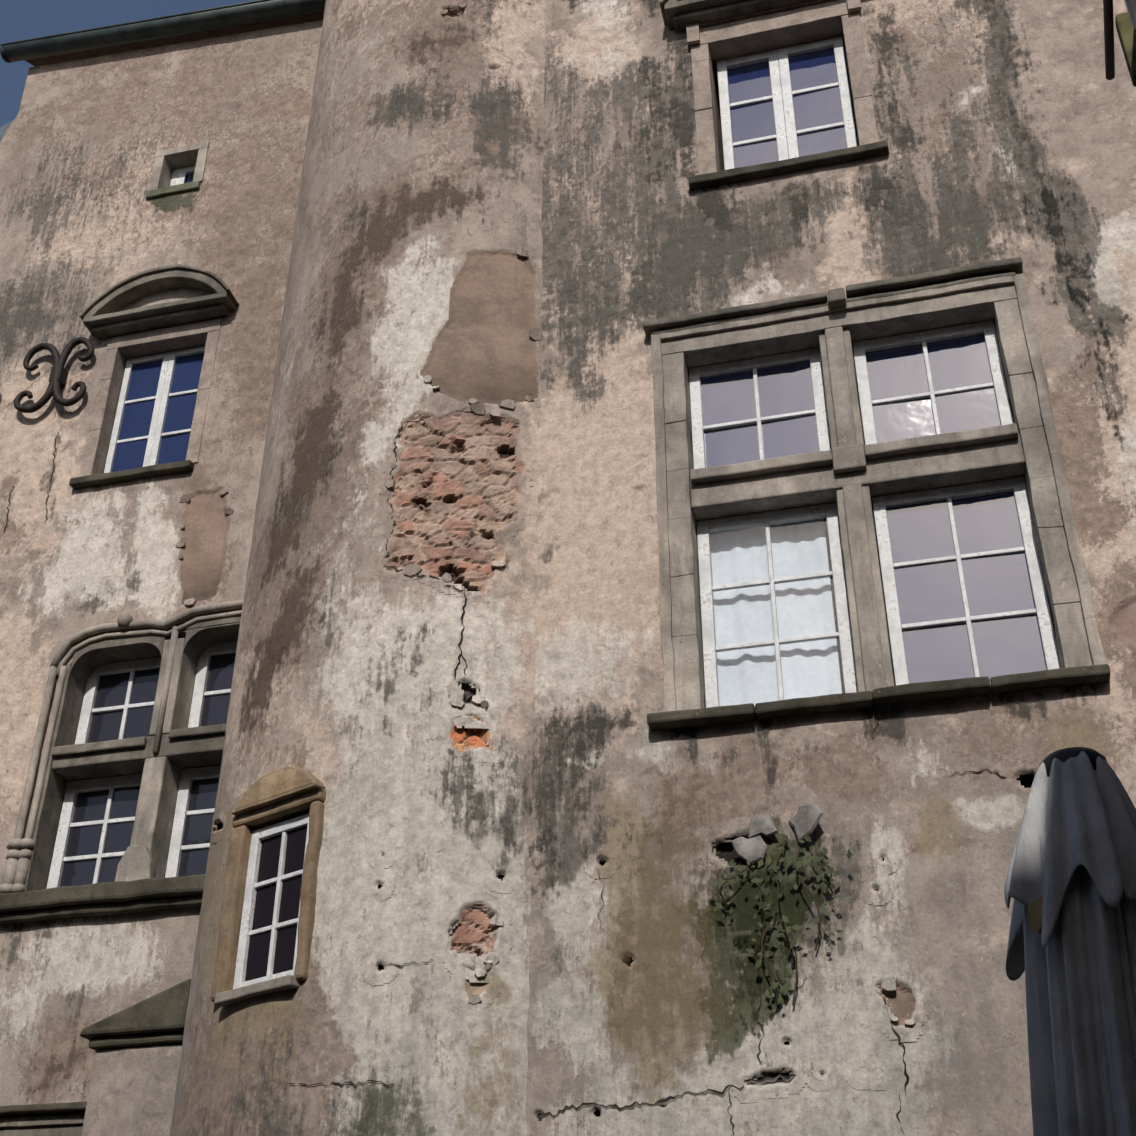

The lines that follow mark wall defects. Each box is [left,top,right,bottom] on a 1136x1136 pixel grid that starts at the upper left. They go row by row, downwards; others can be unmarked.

leakage [367,24,475,129]
leakage [472,84,543,180]
leakage [859,0,1096,311]
leakage [540,39,824,388]
flaking render [374,243,543,603]
peeling [172,481,238,613]
crack [951,769,1007,778]
spalling [698,804,823,879]
peeling [452,952,504,1015]
crack [536,942,807,1136]
leakage [718,939,787,1037]
peeling [861,970,932,1042]